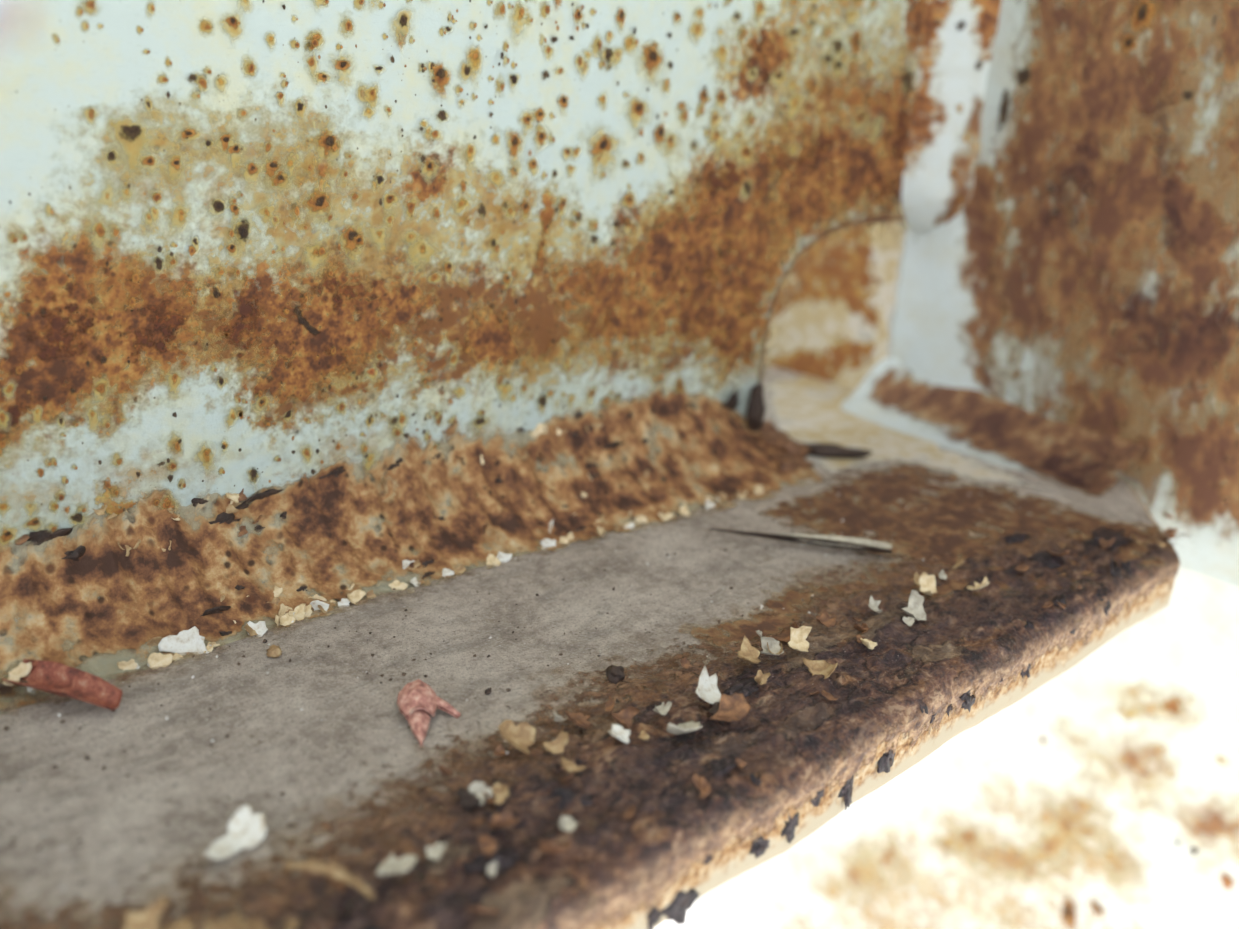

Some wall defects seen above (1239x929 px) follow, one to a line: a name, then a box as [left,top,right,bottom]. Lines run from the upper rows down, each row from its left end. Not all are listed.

corrosion [869,0,1239,535]
corrosion [0,0,954,711]
peeling [902,572,937,621]
peeling [967,577,990,590]
peeling [737,625,812,664]
peeling [860,638,877,650]
corrosion [158,460,1192,929]
peeling [695,666,751,722]
corrosion [0,889,156,929]